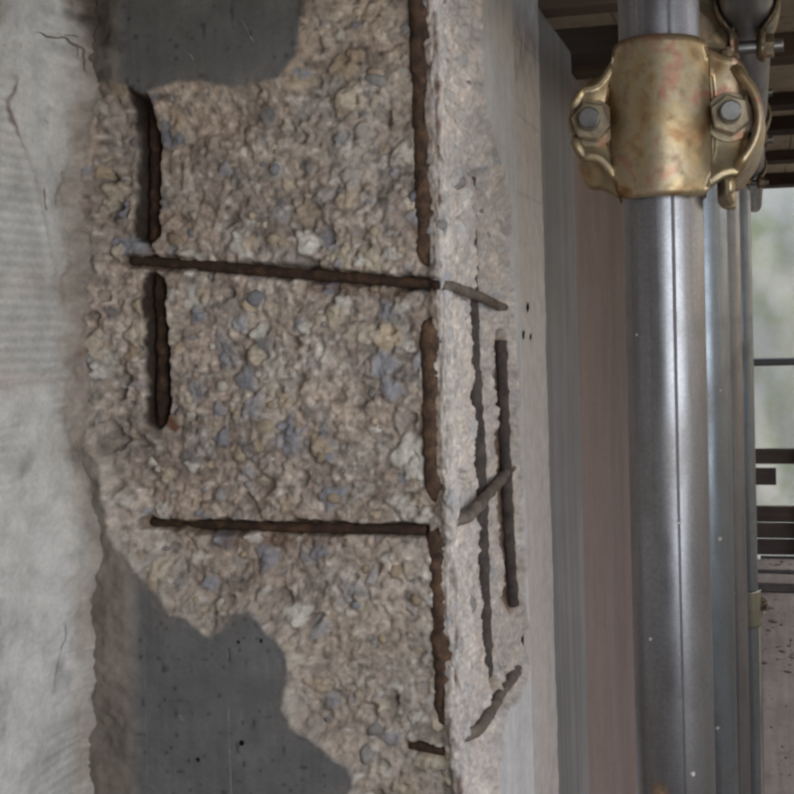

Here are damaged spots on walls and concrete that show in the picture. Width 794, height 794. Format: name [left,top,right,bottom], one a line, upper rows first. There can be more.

crack [37,32,87,74]
spalling [77,0,532,794]